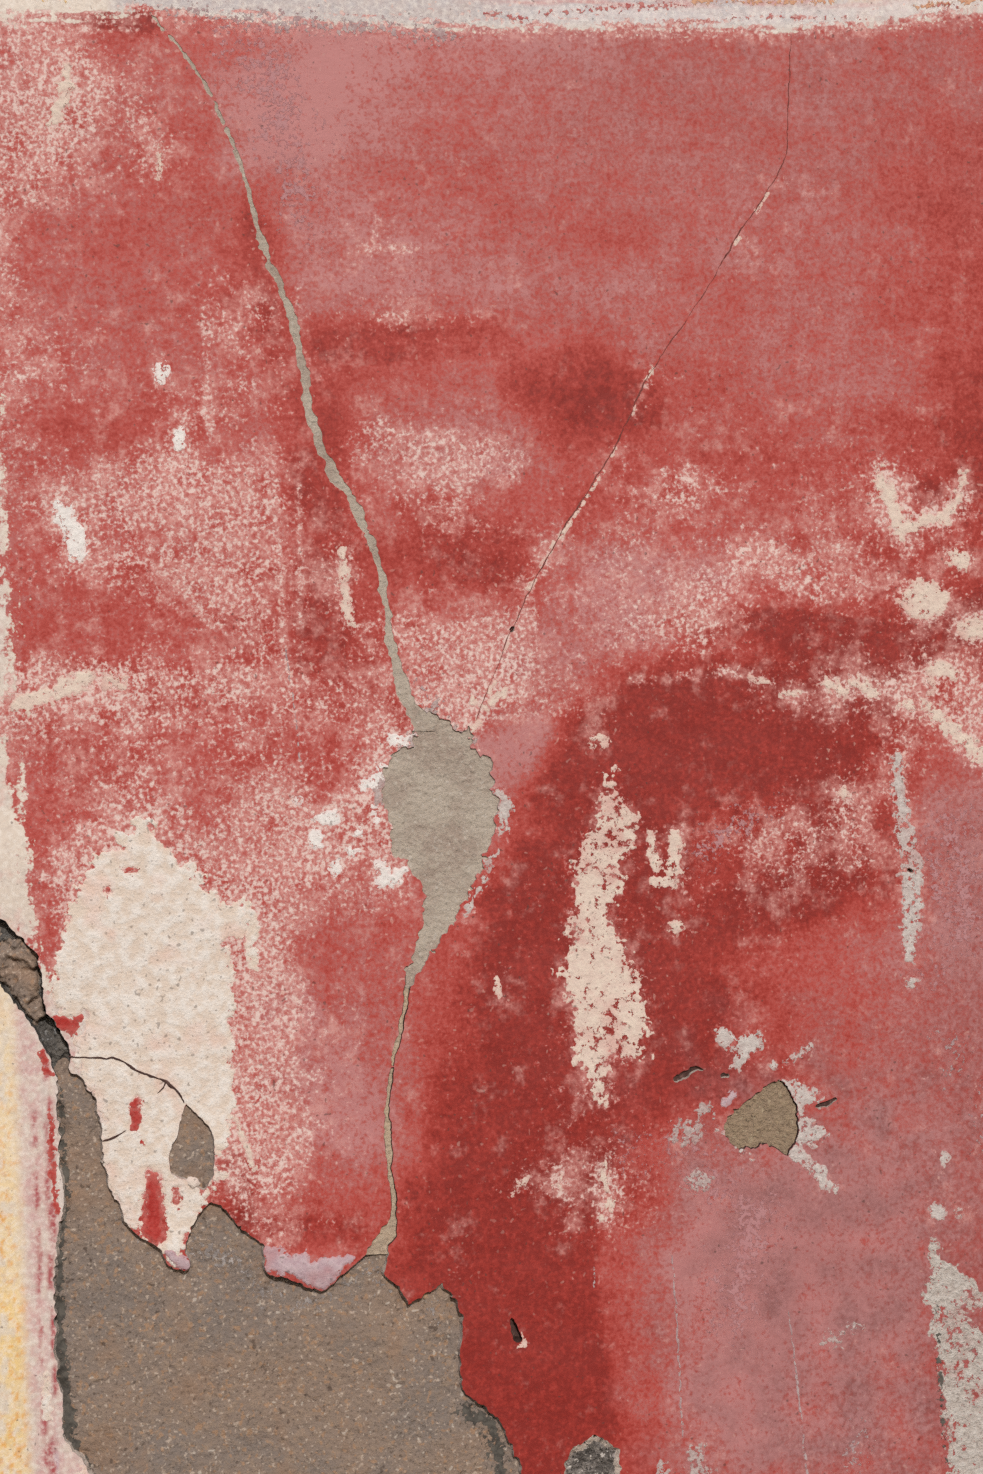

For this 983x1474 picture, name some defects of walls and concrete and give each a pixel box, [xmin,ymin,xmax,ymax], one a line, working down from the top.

crack [151,15,437,731]
crack [476,48,791,720]
crack [0,919,184,1102]
spalling [51,816,522,1474]
crack [366,975,411,1255]
spalling [291,694,500,988]
peeling [551,764,655,1108]
spalling [715,1079,837,1162]
spalling [564,1435,622,1474]
flaking render [921,1237,983,1474]